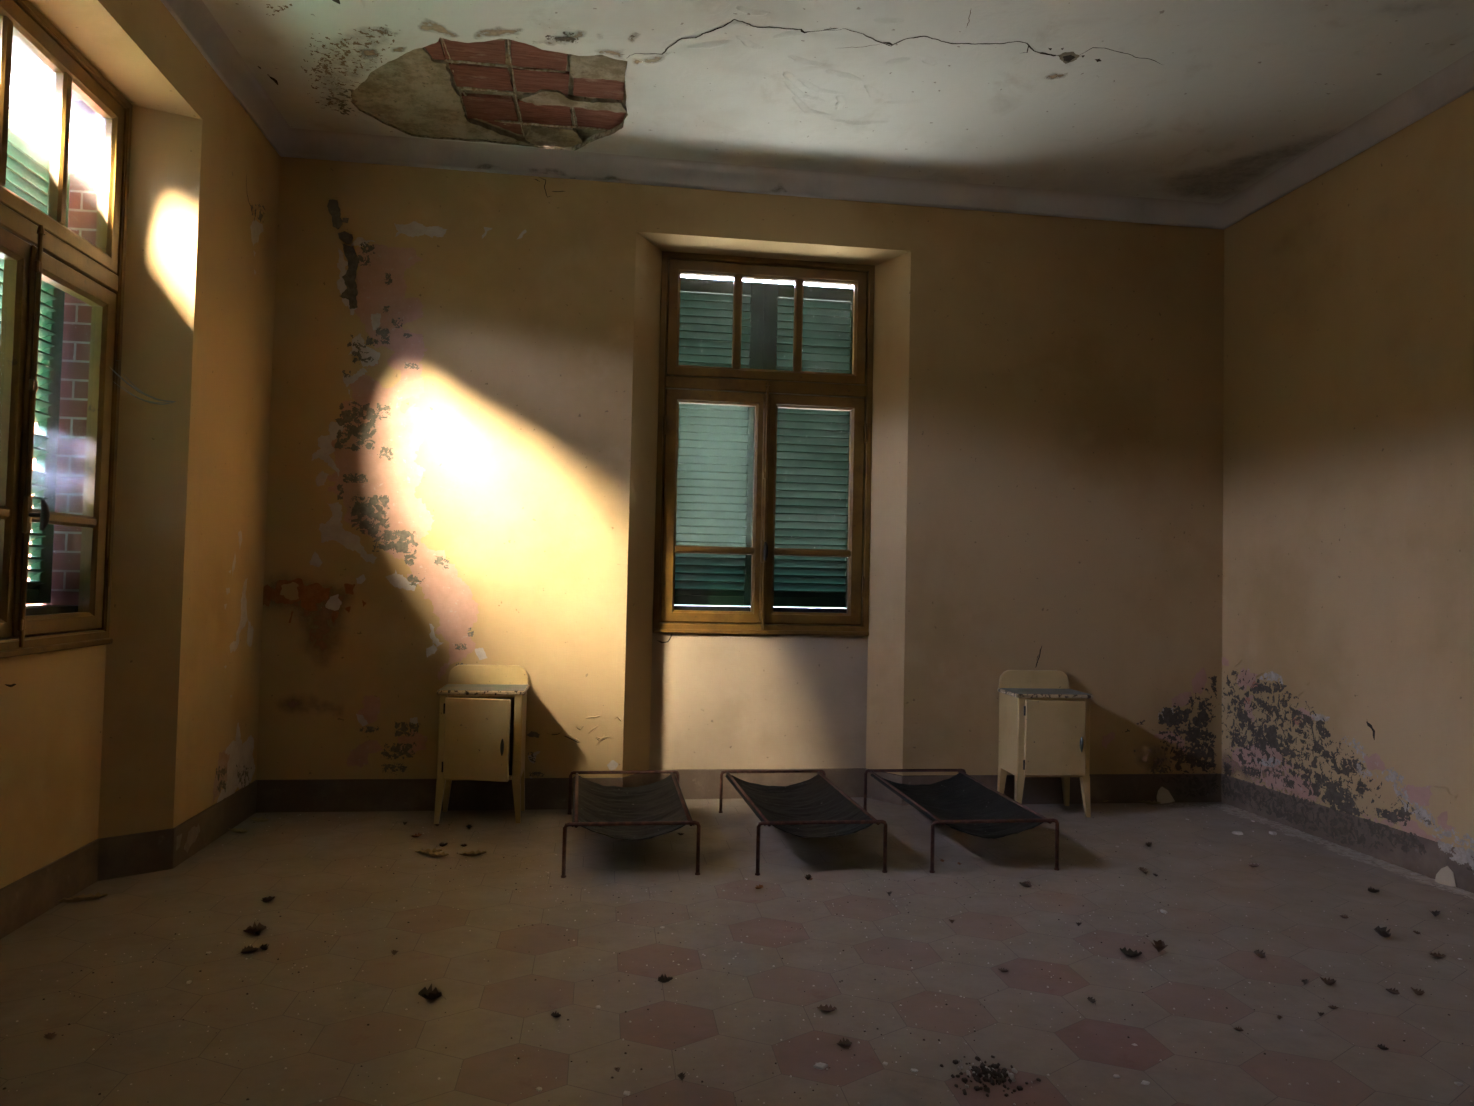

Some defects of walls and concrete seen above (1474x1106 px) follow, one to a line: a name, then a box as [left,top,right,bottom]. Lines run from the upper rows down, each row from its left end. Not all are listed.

spalling [301,27,628,151]
crack [627,10,1163,65]
peeling [309,199,487,681]
peeling [212,722,255,804]
damp [1102,657,1474,900]